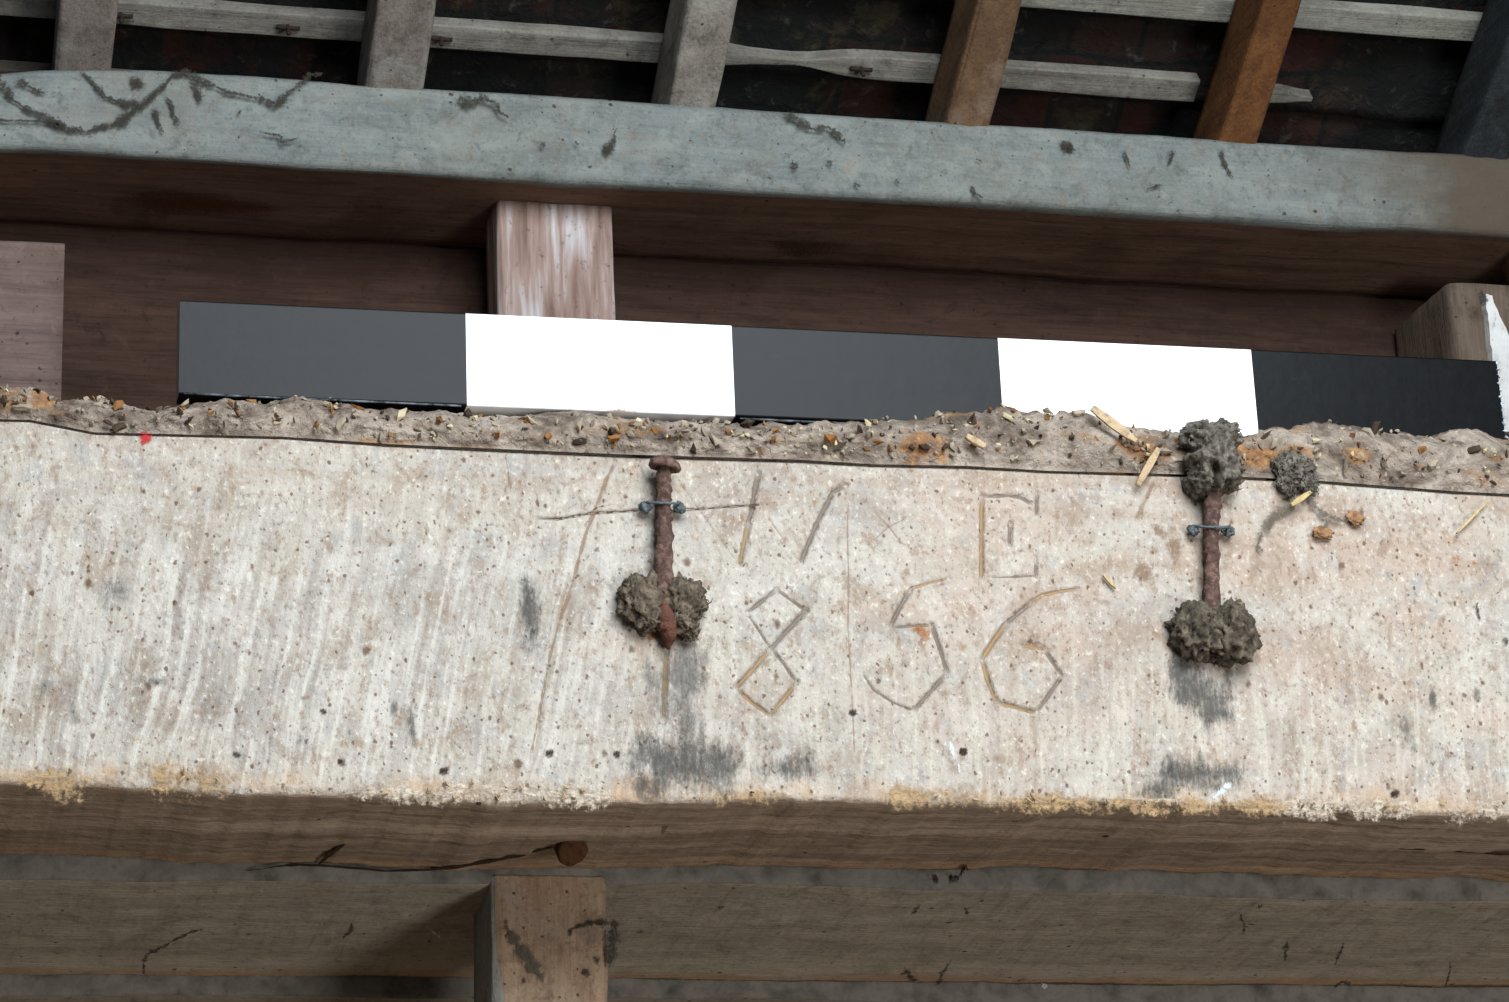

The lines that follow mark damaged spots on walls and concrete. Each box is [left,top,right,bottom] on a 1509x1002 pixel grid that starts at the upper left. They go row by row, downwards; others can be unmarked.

water stain [1169,652,1233,725]
water stain [633,734,743,797]
water stain [764,757,812,778]
water stain [1143,756,1237,799]
crack [247,844,554,872]